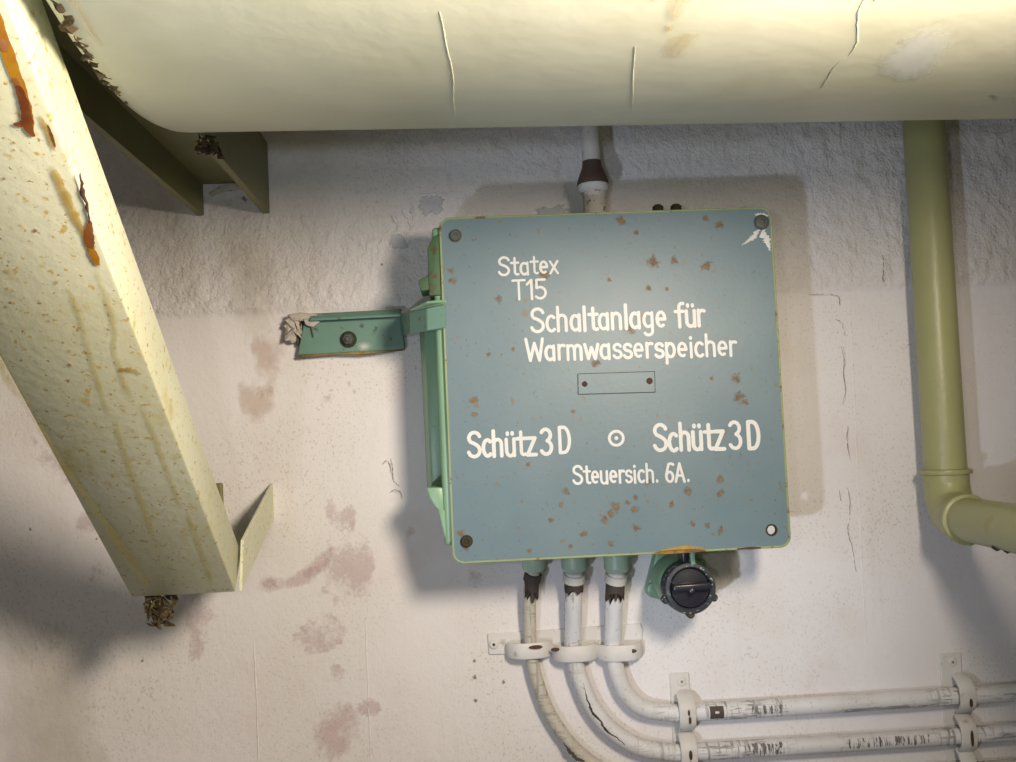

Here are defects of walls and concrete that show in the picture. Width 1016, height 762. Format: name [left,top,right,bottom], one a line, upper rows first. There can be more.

crack [821,0,875,88]